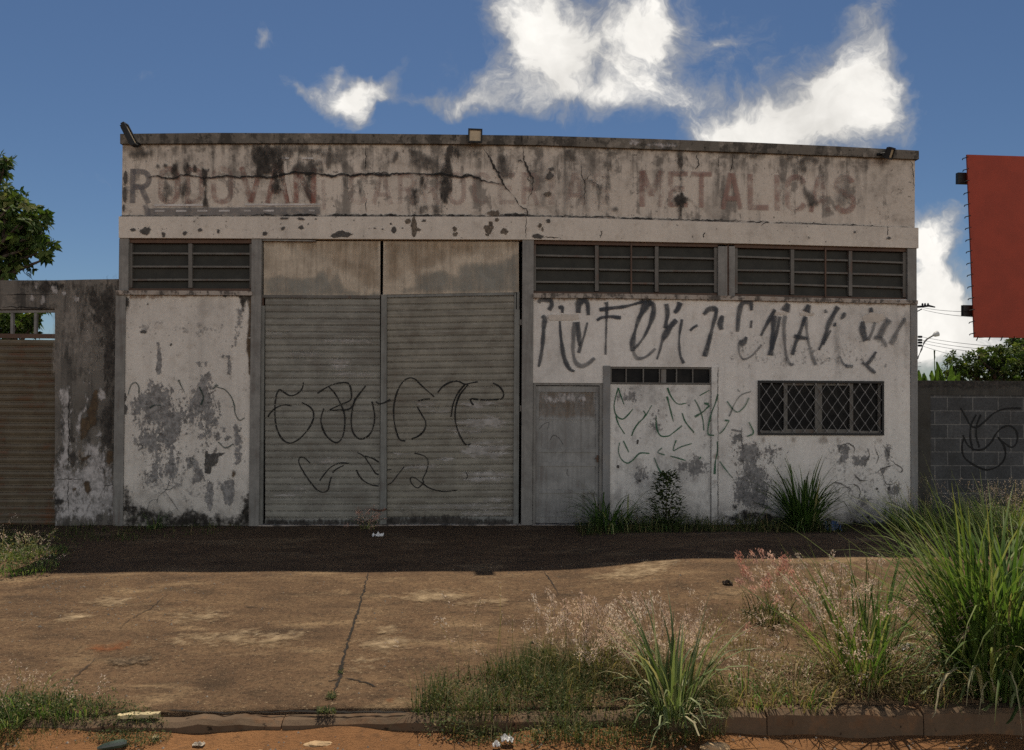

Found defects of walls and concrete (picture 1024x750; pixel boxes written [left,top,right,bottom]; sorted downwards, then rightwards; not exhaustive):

damp [130,150,209,207]
damp [252,144,336,201]
damp [411,144,460,237]
spalling [484,210,509,236]
crack [151,136,888,238]
damp [674,150,688,218]
damp [22,281,129,451]
peeling [220,308,244,375]
peeling [124,342,243,511]
peeling [726,434,788,511]
peeling [831,444,901,510]
crack [169,574,407,714]